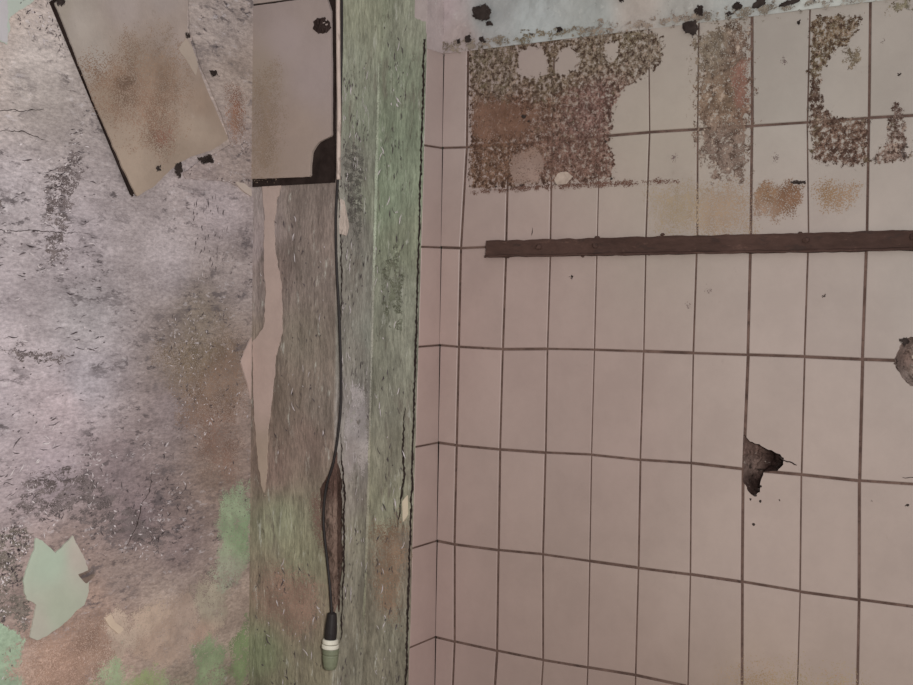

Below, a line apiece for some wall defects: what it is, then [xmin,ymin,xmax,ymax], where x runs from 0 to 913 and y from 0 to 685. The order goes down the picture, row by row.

peeling [0,0,34,45]
spalling [894,337,913,386]
spalling [743,436,796,503]
peeling [0,459,177,685]